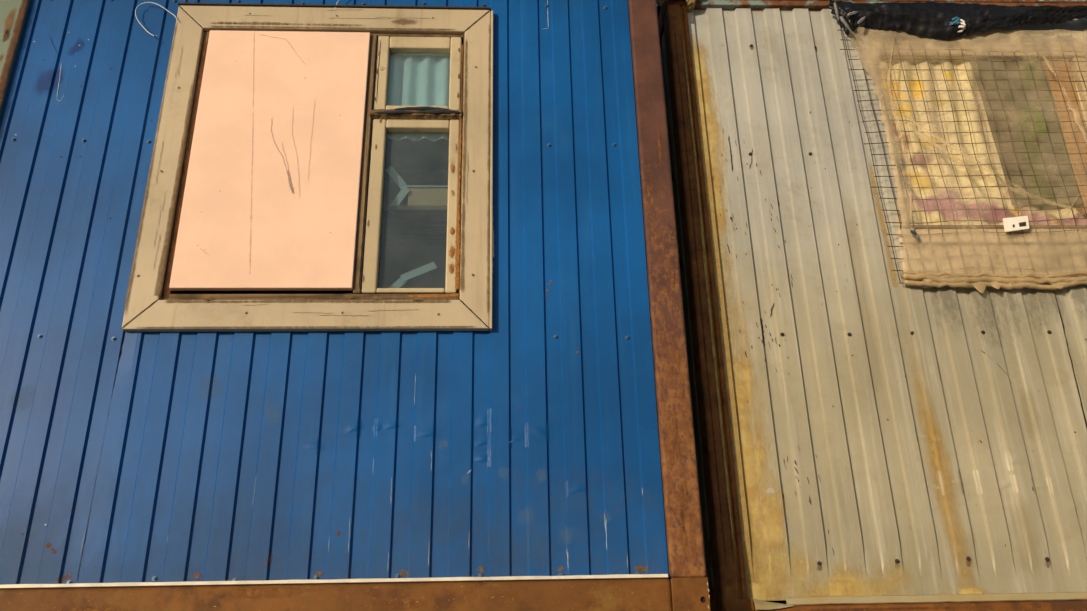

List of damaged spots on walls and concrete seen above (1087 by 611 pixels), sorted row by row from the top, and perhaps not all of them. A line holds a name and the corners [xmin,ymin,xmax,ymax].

corrosion [407,45,463,298]
corrosion [674,33,804,601]
crack [1054,292,1087,428]
corrosion [797,563,928,611]